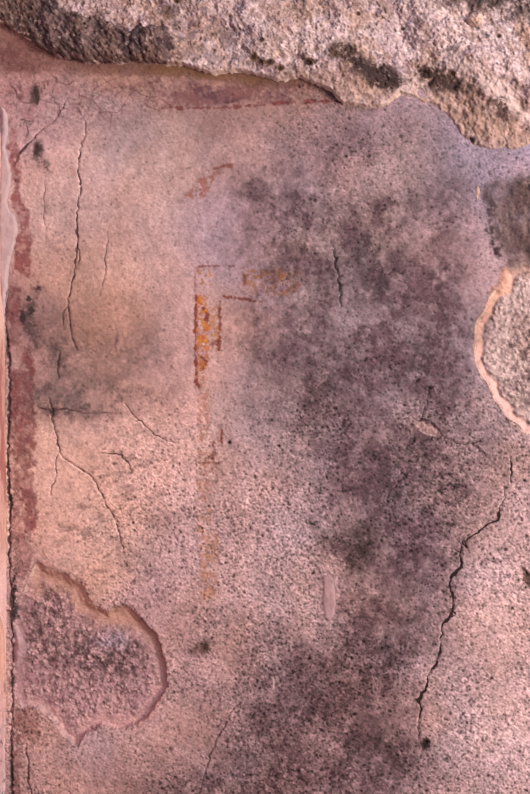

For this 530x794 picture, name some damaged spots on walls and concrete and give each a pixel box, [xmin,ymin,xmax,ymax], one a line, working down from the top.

flaking render [0,0,530,149]
peeling [7,144,32,276]
peeling [10,349,37,541]
crack [41,399,124,549]
crack [12,75,177,327]
water stain [241,180,474,589]
spalling [473,177,530,435]
spalling [0,556,168,794]
water stain [191,640,210,653]
water stain [196,589,437,794]
crack [417,458,518,738]